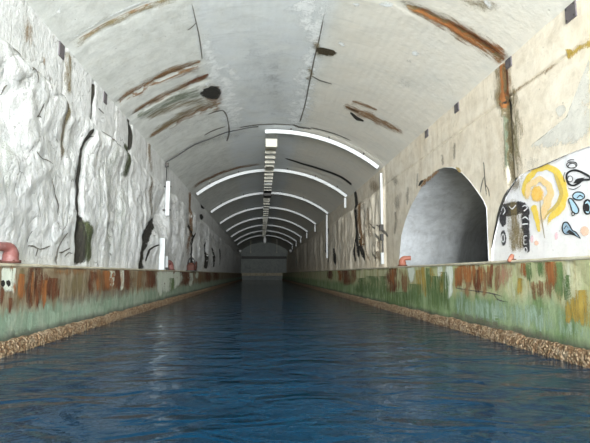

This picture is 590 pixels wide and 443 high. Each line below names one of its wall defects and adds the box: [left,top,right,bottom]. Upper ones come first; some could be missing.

crack [188,6,202,58]
spalling [200,82,222,106]
leakage [119,0,330,208]
crack [205,17,349,141]
spalling [312,40,336,57]
rust [343,101,402,134]
rust [403,1,514,109]
leakage [500,87,525,193]
crack [285,158,388,261]
leakage [503,200,525,253]
rust [88,270,157,292]
rust [453,263,526,297]